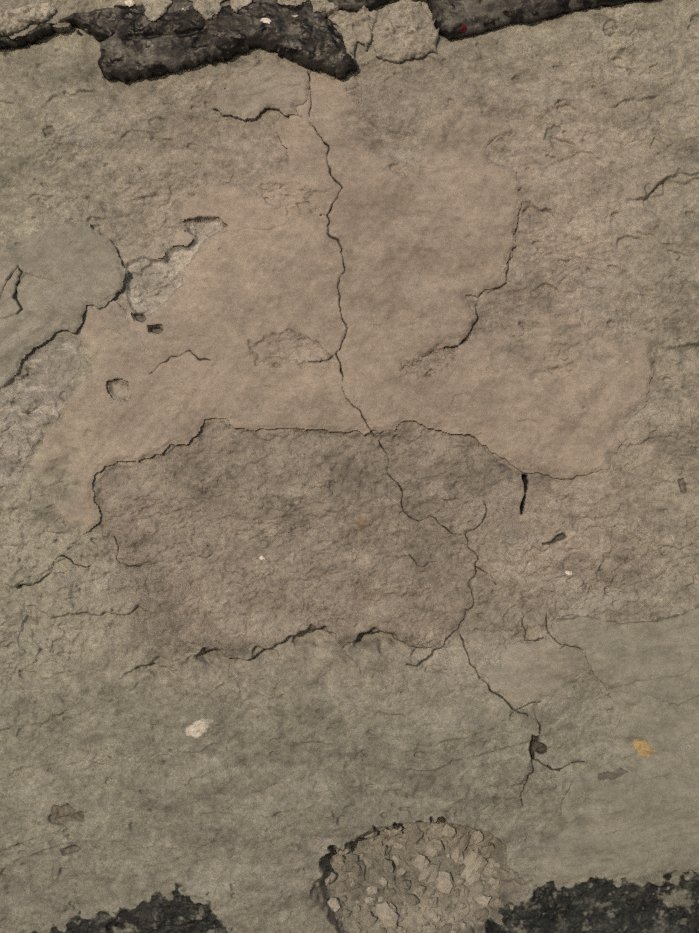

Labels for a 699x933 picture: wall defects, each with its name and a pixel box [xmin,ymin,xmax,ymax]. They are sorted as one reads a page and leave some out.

crack [0,266,23,314]
spalling [124,219,226,322]
crack [308,71,585,805]
spalling [95,421,511,655]
spalling [520,474,528,514]
damp [313,839,334,853]